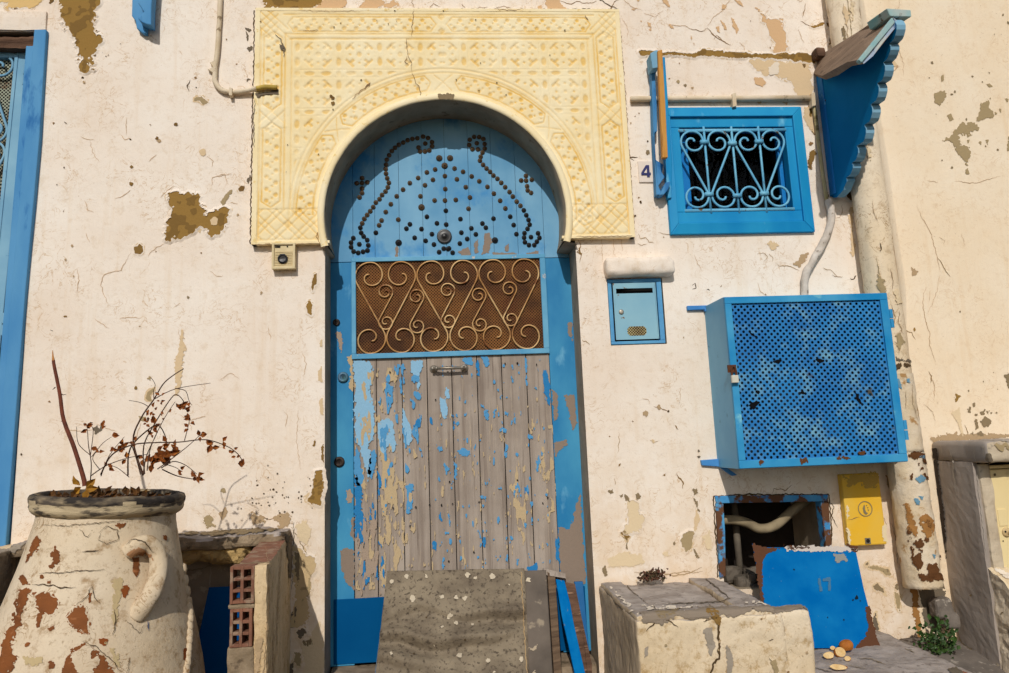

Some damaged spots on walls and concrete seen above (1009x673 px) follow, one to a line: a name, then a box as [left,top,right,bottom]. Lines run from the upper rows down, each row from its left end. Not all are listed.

peeling [260,0,401,11]
peeling [716,0,743,34]
peeling [636,7,818,169]
peeling [929,75,956,105]
peeling [944,72,1009,174]
spalling [131,175,251,257]
spalling [608,489,648,549]
spalling [673,488,700,558]
spalling [290,544,319,673]
spalling [602,566,808,626]
crack [627,485,847,673]